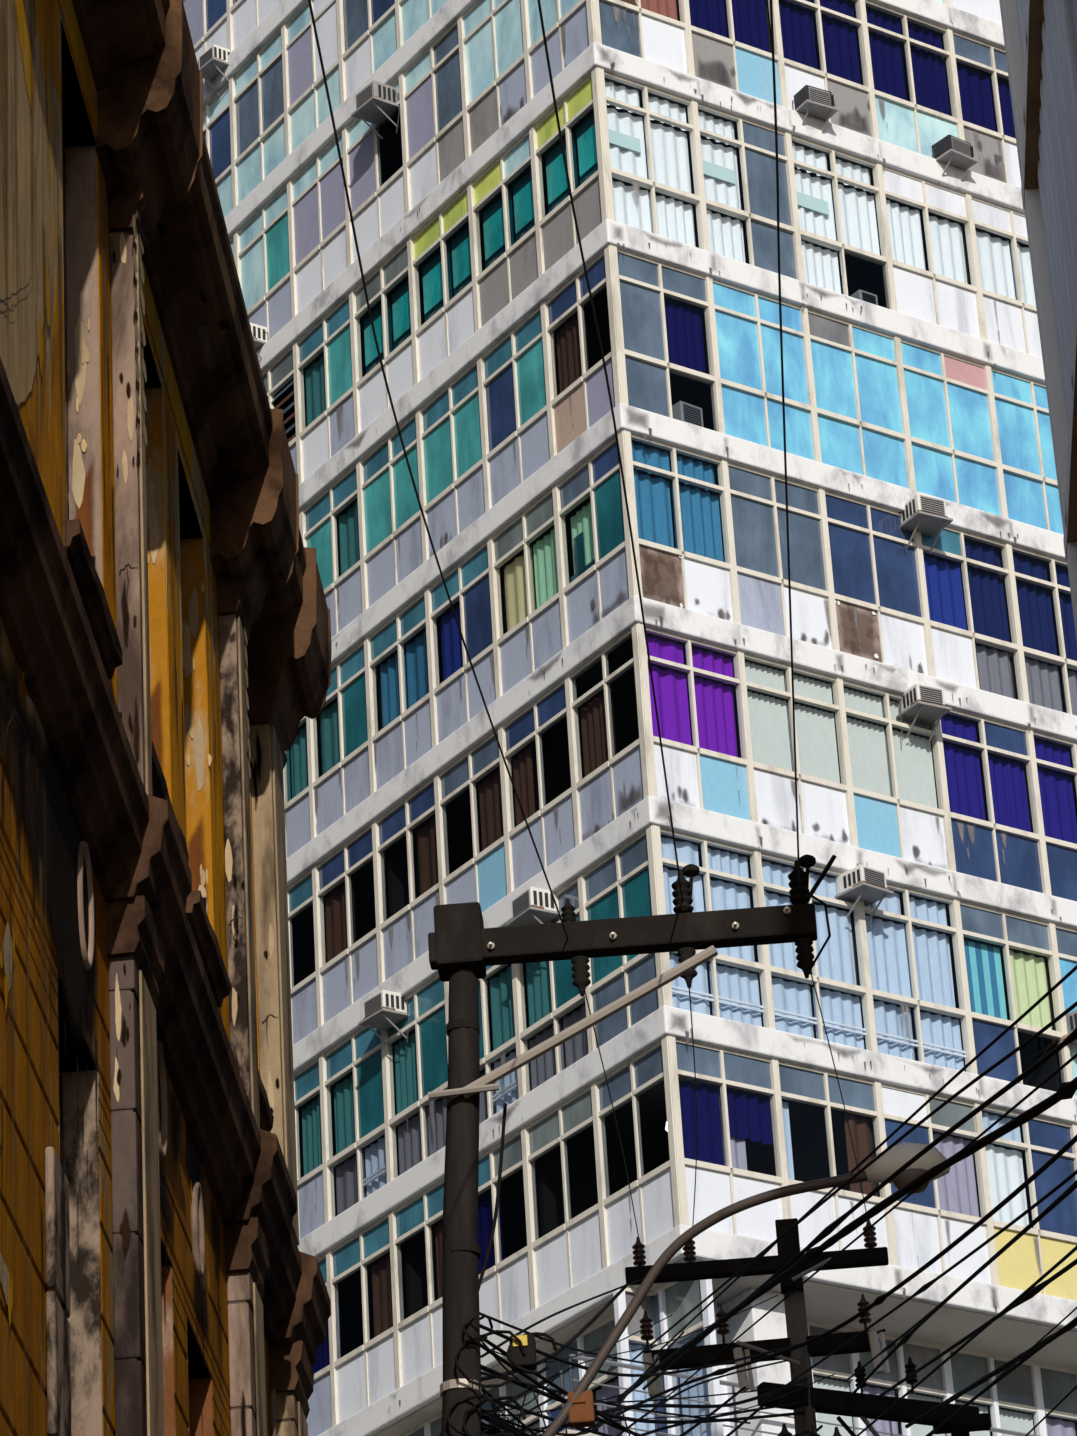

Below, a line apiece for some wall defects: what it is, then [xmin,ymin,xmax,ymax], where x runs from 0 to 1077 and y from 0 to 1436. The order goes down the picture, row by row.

peeling [0,0,51,406]
crack [0,275,33,312]
spalling [122,582,136,647]
peeling [182,582,205,677]
spalling [129,702,139,763]
peeling [186,717,212,790]